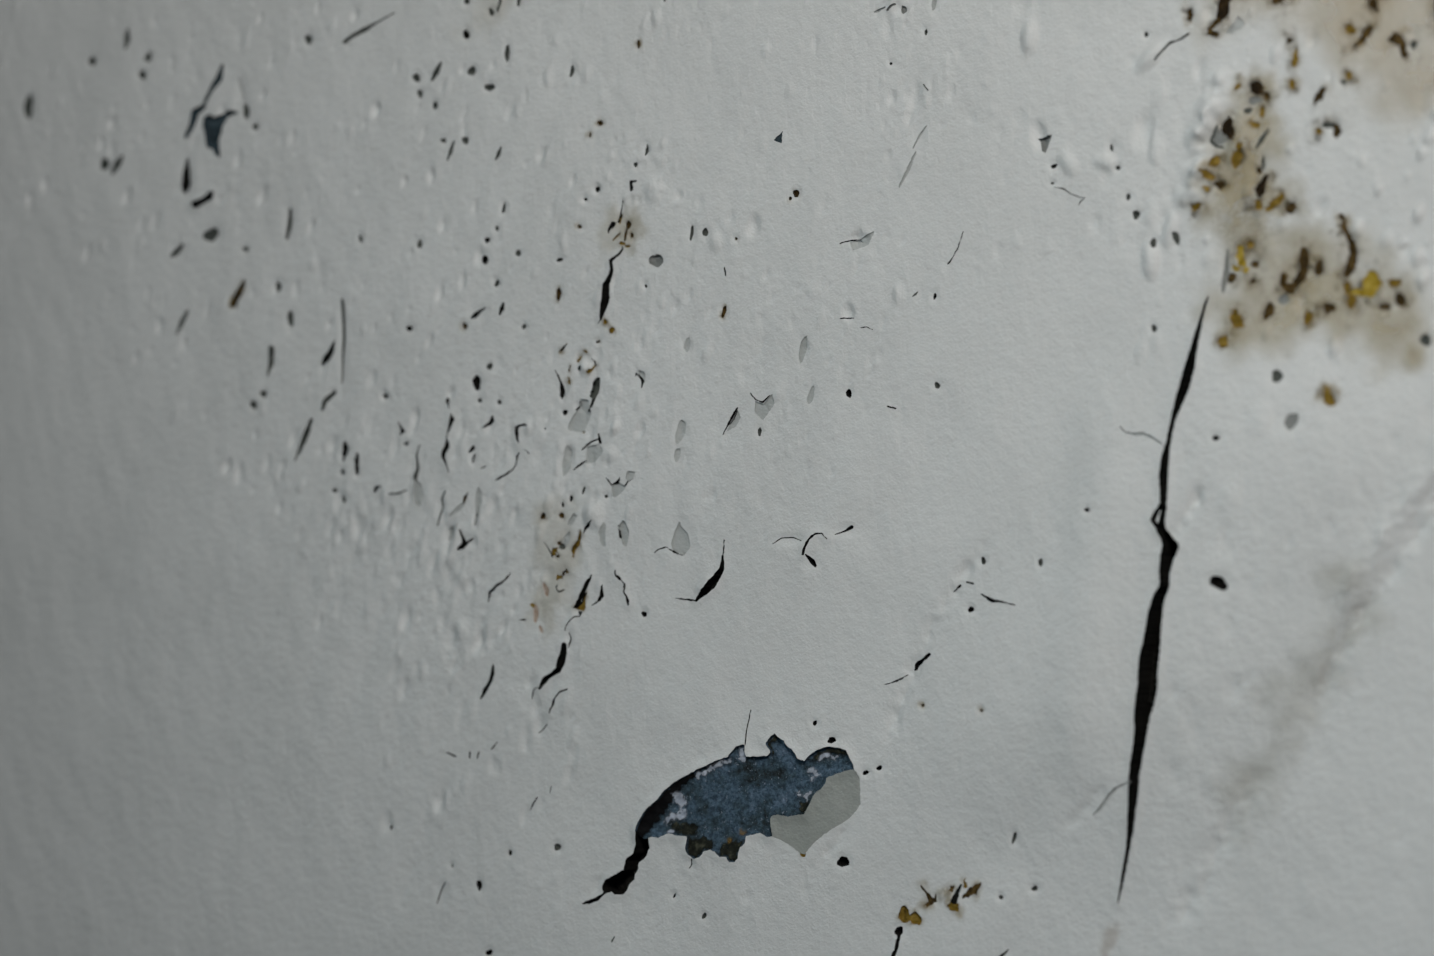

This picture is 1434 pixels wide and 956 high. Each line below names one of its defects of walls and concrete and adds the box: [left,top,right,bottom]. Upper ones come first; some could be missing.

damp [1206,0,1231,38]
damp [1340,0,1418,59]
peeling [181,157,213,209]
peeling [184,64,258,159]
peeling [412,62,442,110]
damp [1190,80,1297,225]
damp [1314,122,1342,139]
damp [1313,71,1353,106]
damp [1263,213,1408,333]
peeling [294,299,346,461]
crack [1093,295,1209,903]
peeling [581,710,861,904]